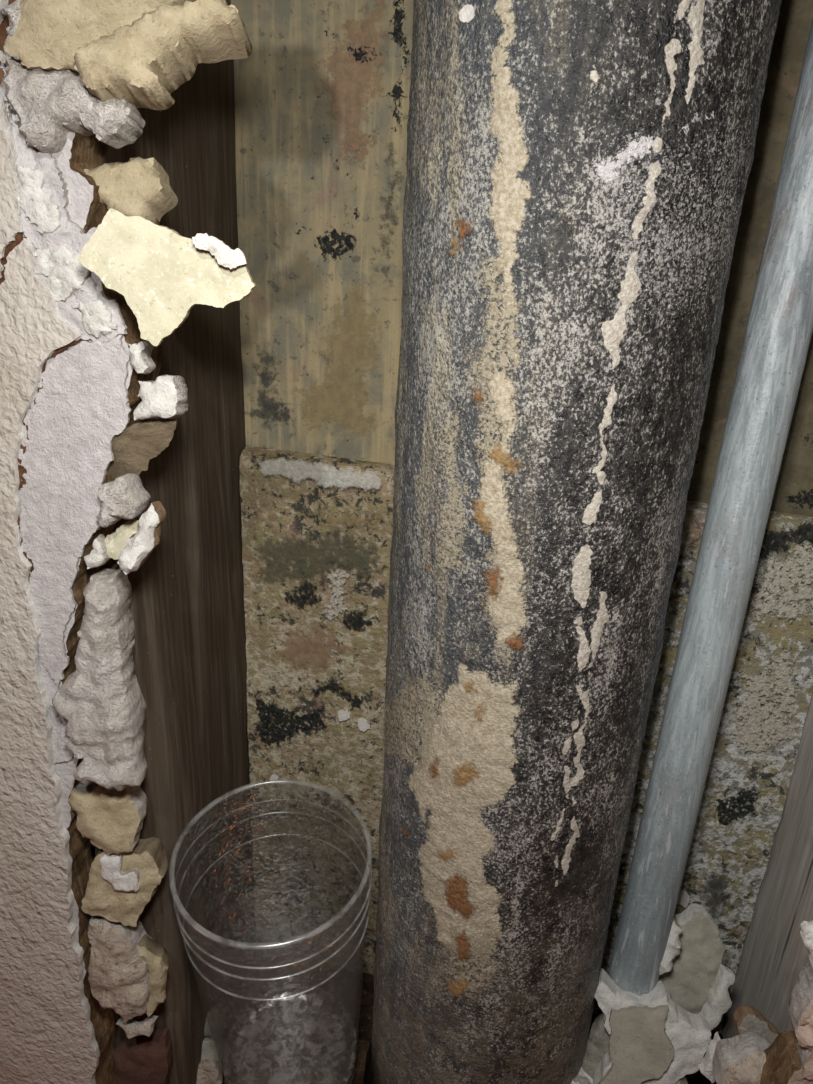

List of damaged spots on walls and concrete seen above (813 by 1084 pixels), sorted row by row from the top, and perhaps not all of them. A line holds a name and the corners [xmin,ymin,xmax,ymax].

crack [0,0,15,84]
crack [0,232,27,285]
spalling [0,50,148,791]
leakage [257,458,381,489]
leakage [380,0,532,998]
corrosion [474,500,493,533]
corrosion [479,567,503,600]
leakage [751,489,813,623]
leakage [255,678,370,748]
corrosion [452,762,479,787]
spalling [788,959,813,1080]
spalling [698,1032,721,1083]